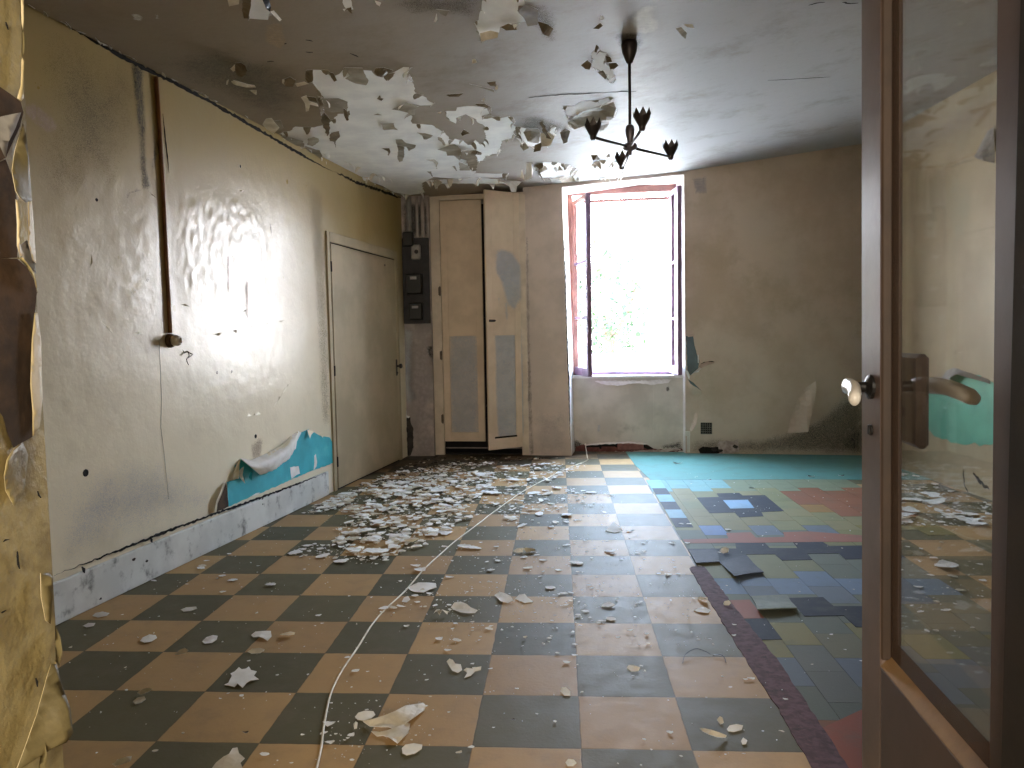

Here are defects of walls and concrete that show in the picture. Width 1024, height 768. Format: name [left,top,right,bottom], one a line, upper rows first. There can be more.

peeling [228,0,281,21]
peeling [475,0,553,43]
peeling [226,62,257,95]
peeling [581,44,619,84]
flaking render [0,159,18,259]
water stain [128,63,159,195]
peeling [262,53,617,200]
peeling [591,153,625,183]
peeling [215,429,333,511]
crack [56,474,322,575]